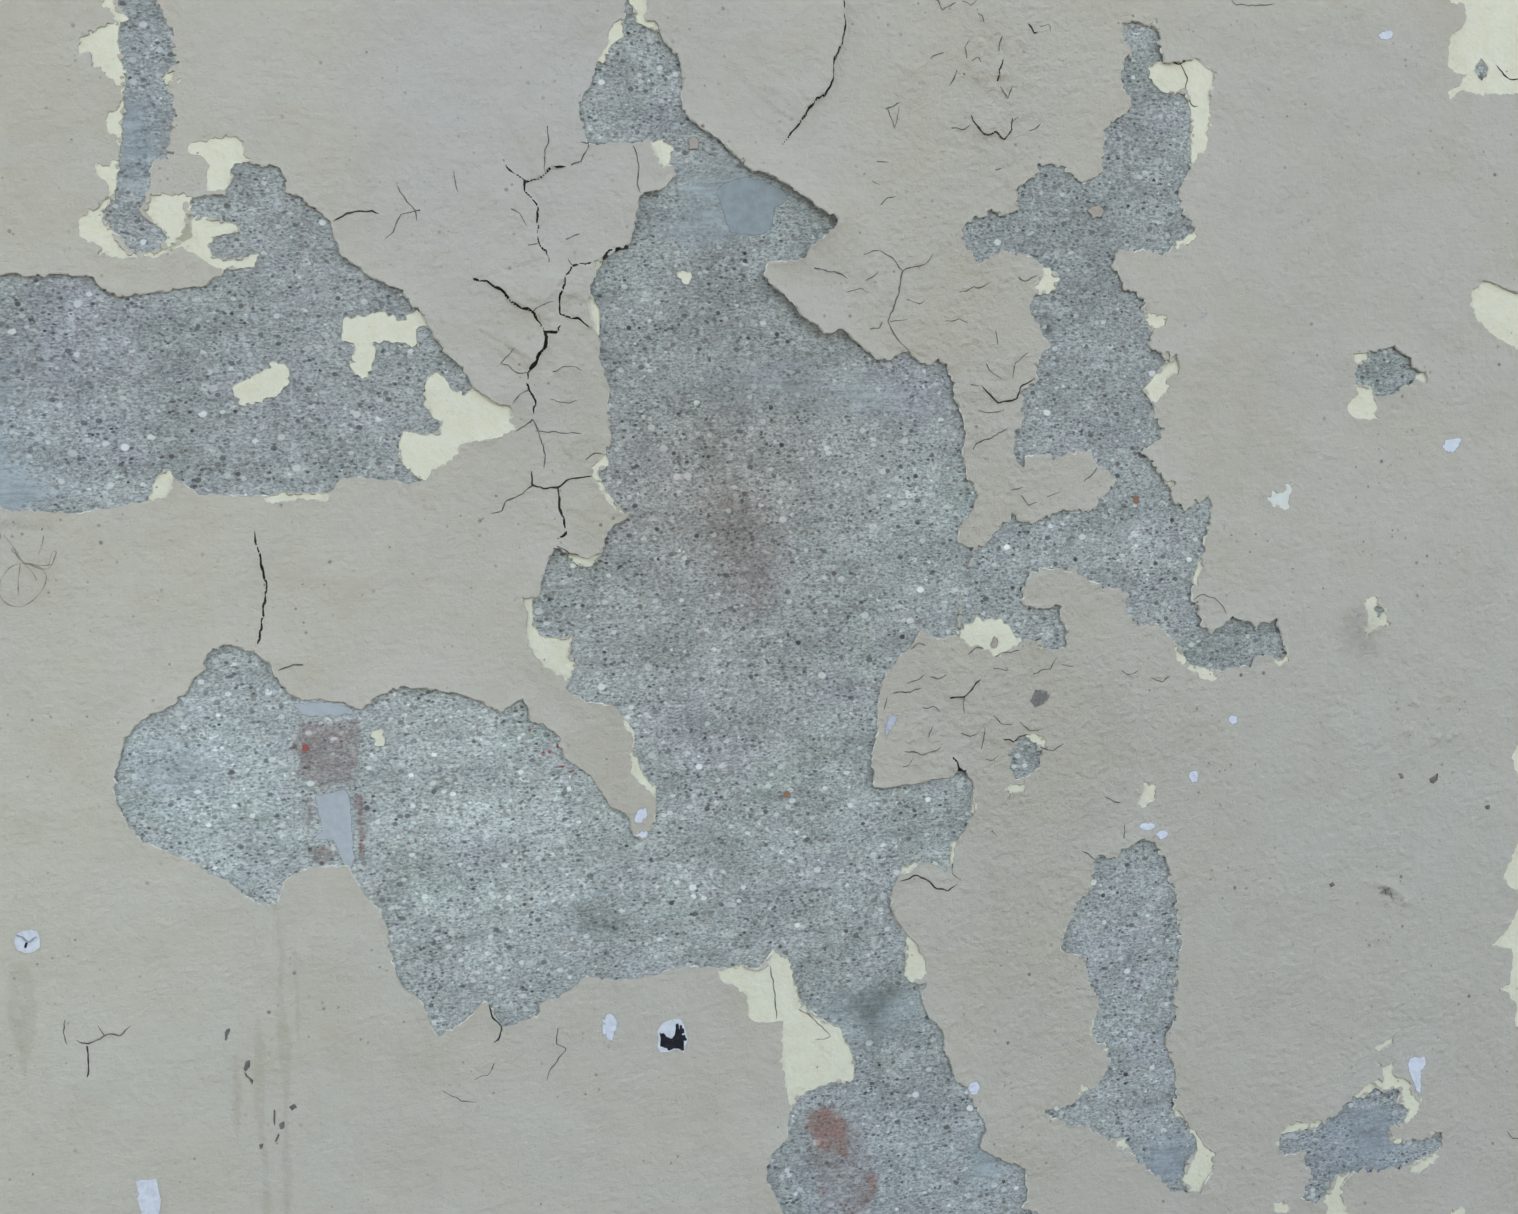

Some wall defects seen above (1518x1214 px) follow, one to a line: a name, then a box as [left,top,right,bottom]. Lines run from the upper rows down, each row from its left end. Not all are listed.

crack [782,0,846,144]
peeling [1448,0,1518,100]
crack [632,146,640,191]
peeling [0,0,515,514]
crack [474,126,629,555]
peeling [1347,345,1428,420]
peeling [1470,280,1518,350]
crack [254,532,303,671]
peeling [112,0,1292,1214]
peeling [1503,843,1518,891]
peeling [1492,909,1518,1027]
peeling [1274,1034,1444,1214]